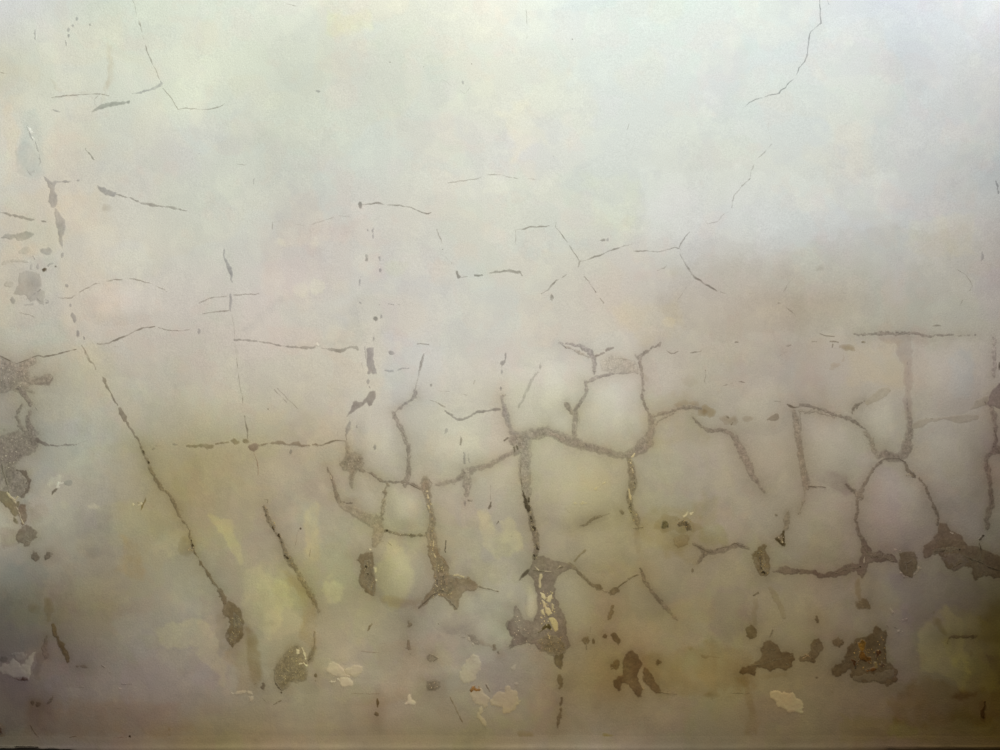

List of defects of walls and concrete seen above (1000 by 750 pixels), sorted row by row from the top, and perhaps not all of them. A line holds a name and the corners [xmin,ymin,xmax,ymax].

crack [0,148,187,258]
crack [515,122,772,306]
spalling [0,429,93,562]
water stain [28,597,70,681]
crack [262,498,321,651]
spalling [231,642,363,705]
crack [0,192,766,621]
spalling [418,545,499,610]
spalling [459,555,677,727]
spalling [739,624,844,714]
spalling [751,511,1000,581]
crack [775,324,1000,540]